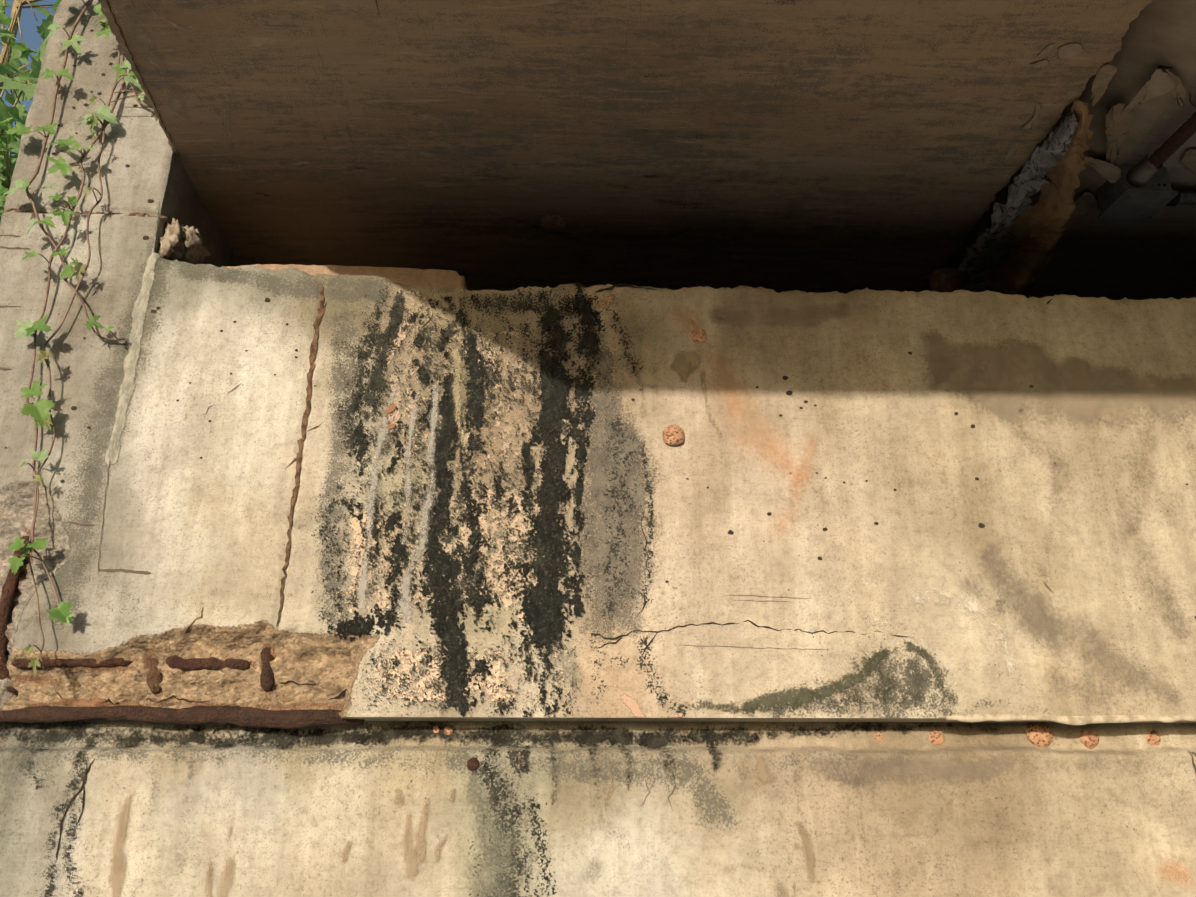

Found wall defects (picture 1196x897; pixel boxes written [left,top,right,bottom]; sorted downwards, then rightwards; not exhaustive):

peeling [1087,64,1187,183]
peeling [435,322,524,470]
leakage [925,333,1196,423]
spalling [0,480,572,718]
leakage [0,281,953,897]
crack [590,511,911,656]
corrosion [29,692,174,707]